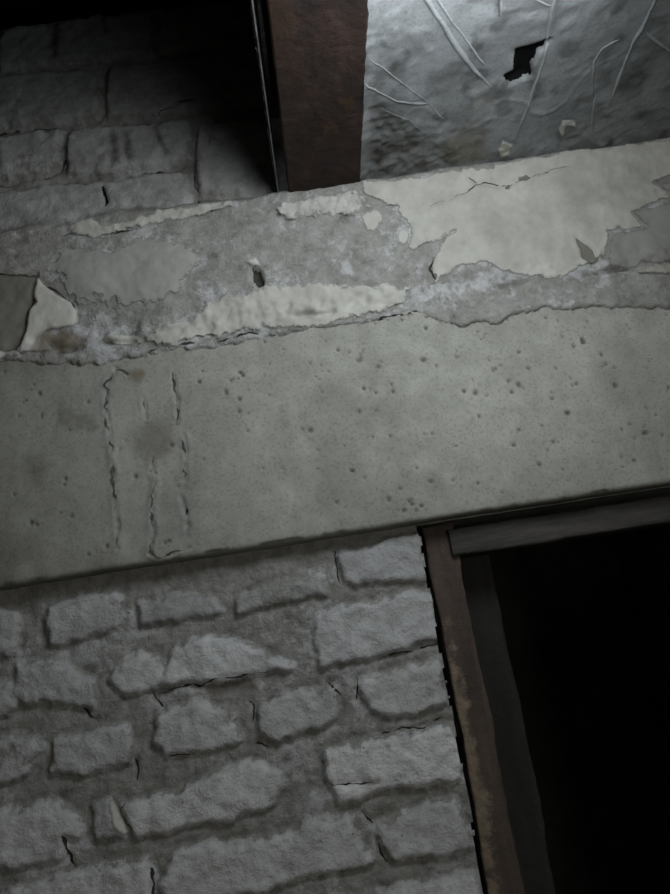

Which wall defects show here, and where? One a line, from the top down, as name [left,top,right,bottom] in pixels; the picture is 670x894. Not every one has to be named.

hole [503,37,551,81]
peeling [64,201,233,238]
peeling [361,140,670,283]
peeling [0,273,79,358]
peeling [102,257,420,352]
crack [103,369,128,542]
crack [172,373,189,525]
crack [149,483,190,558]
crack [153,671,269,706]
crack [62,836,76,866]